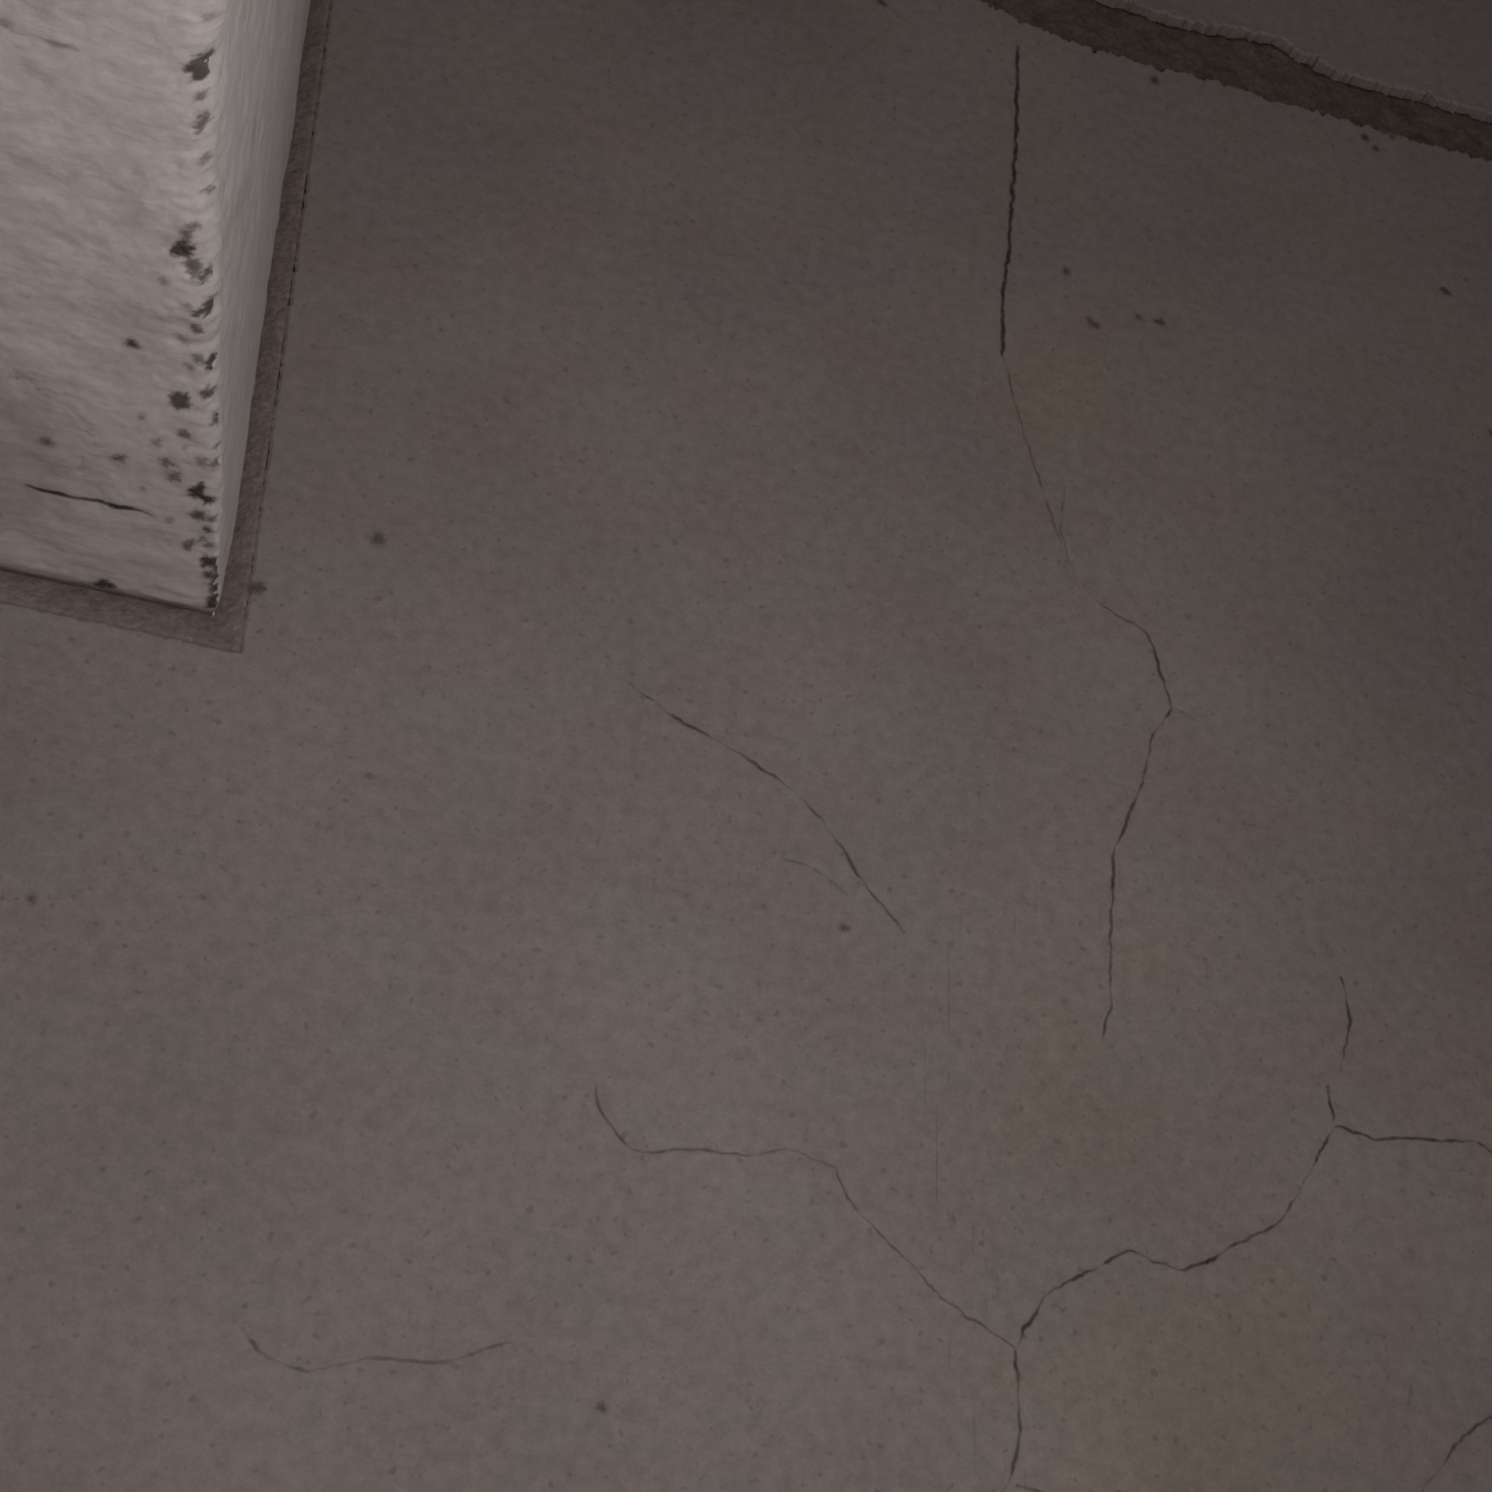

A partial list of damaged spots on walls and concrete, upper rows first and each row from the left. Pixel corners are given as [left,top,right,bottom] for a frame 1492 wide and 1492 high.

spalling [186,50,213,80]
crack [1001,49,1020,355]
spalling [170,231,214,333]
spalling [170,389,214,410]
spalling [184,482,219,608]
spalling [94,580,116,588]
crack [1152,651,1171,737]
crack [1111,783,1143,889]
crack [1316,1098,1480,1161]
crack [1070,1205,1291,1281]
crack [1014,1311,1037,1371]